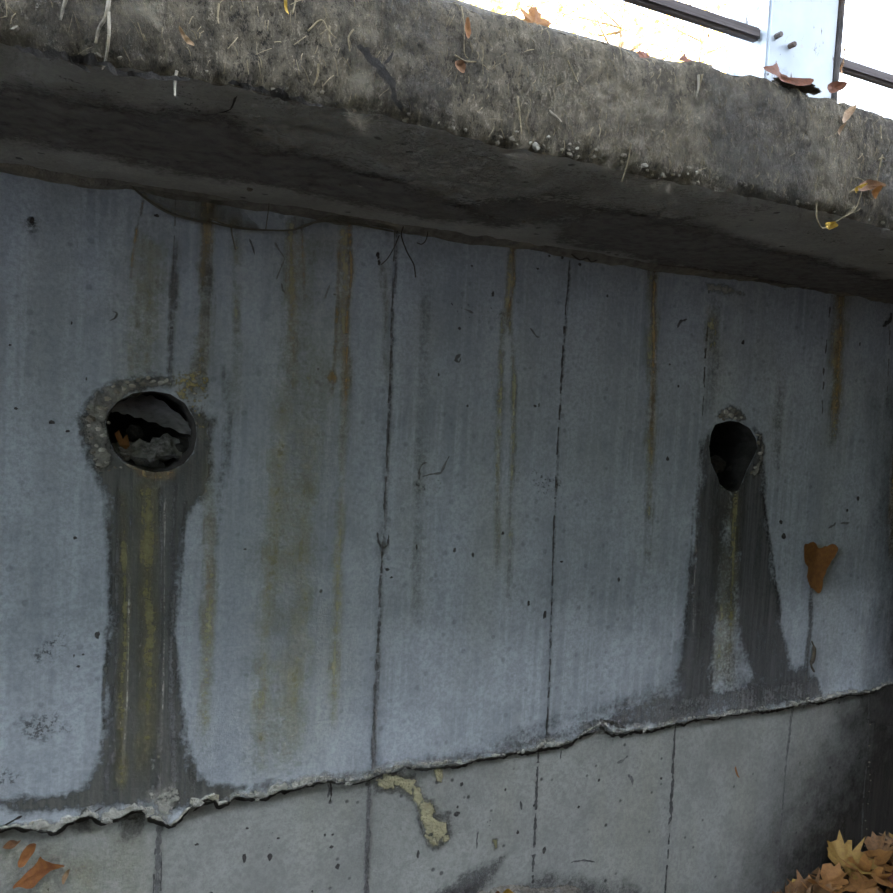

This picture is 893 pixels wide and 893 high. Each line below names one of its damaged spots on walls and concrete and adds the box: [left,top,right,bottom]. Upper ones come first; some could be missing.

rust [327,225,353,402]
spalling [84,372,209,471]
spalling [718,405,746,421]
water stain [0,408,271,840]
crack [0,230,893,893]
water stain [385,435,822,772]
spalling [0,753,505,849]
spalling [517,682,892,754]
water stain [762,595,893,893]